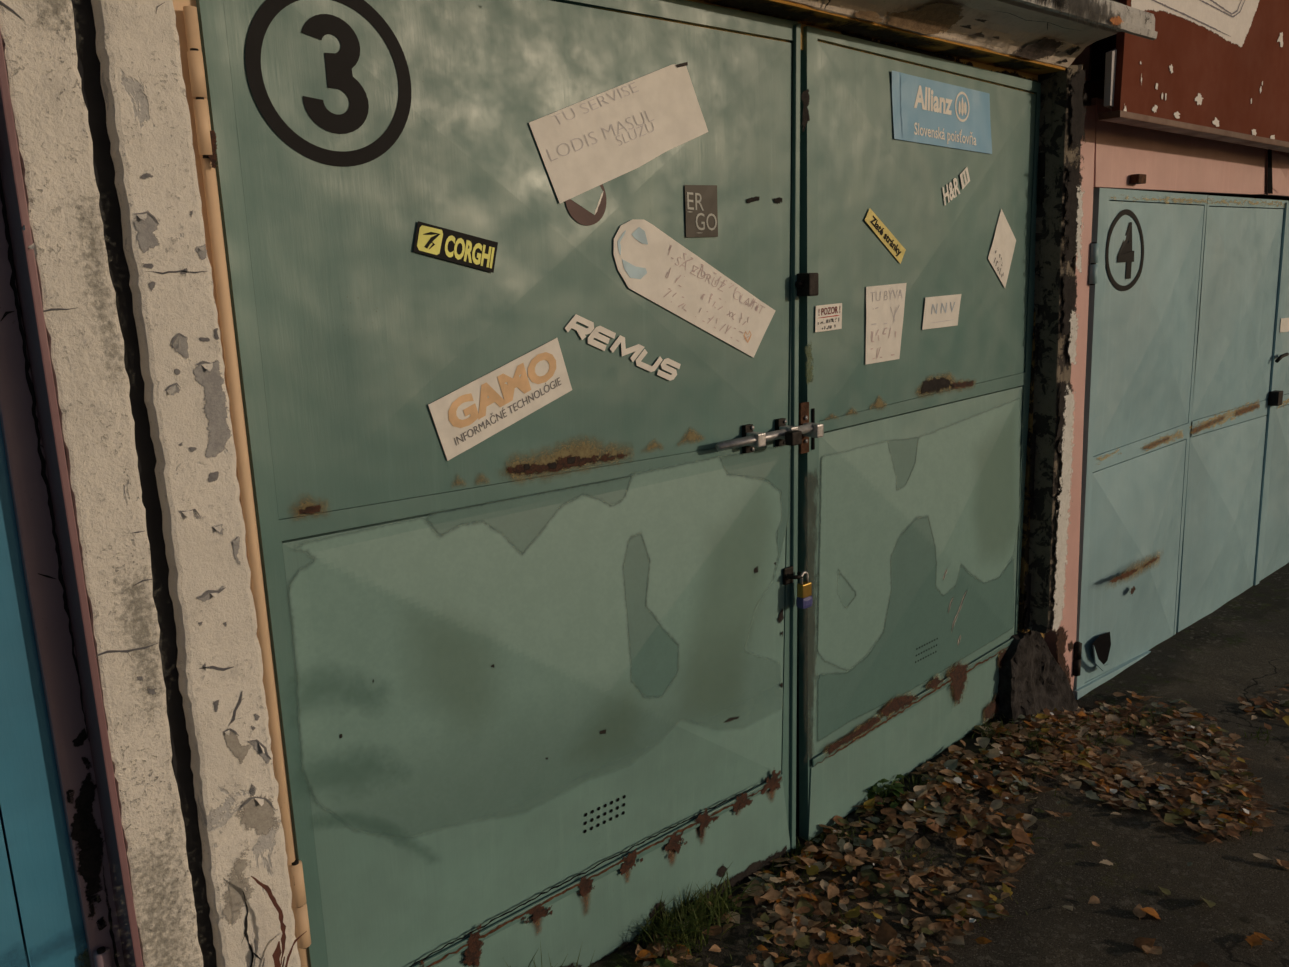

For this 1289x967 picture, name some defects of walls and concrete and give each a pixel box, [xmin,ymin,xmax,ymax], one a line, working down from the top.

peeling [1140,61,1180,119]
rust [209,130,218,168]
peeling [134,210,159,291]
peeling [165,328,232,482]
rust [918,375,973,396]
rust [507,441,631,481]
peeling [197,586,226,602]
rust [817,646,1010,763]
peeling [224,714,272,764]
peeling [66,728,106,930]
peeling [236,785,280,835]
rust [409,769,787,967]